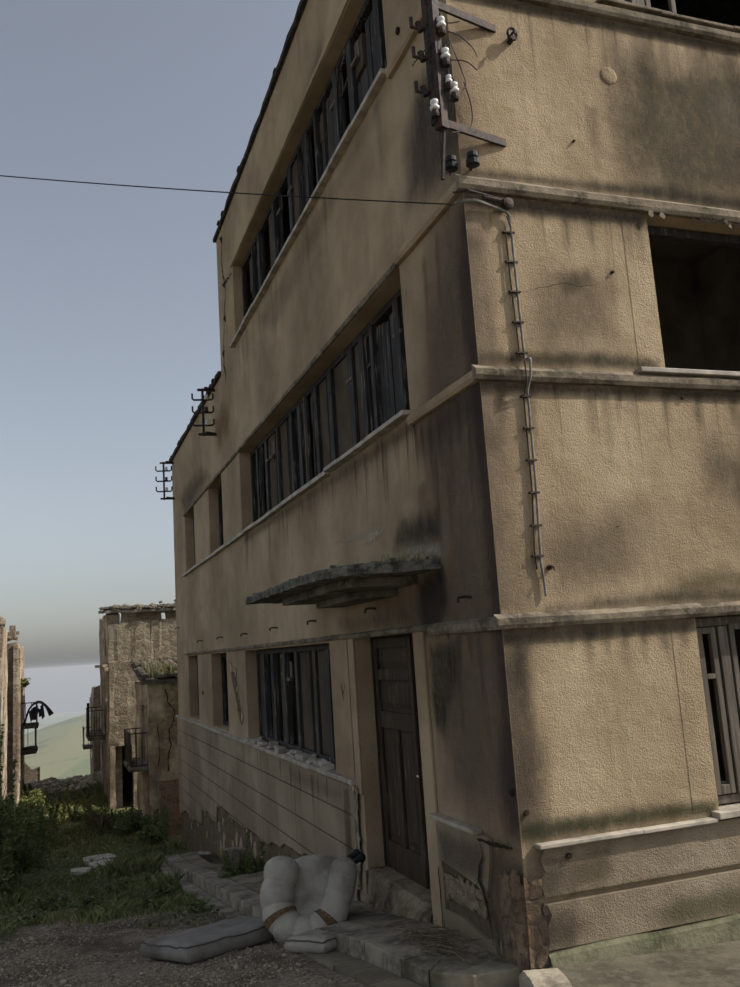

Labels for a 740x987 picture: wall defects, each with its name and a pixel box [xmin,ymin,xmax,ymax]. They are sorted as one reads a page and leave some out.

water stain [591,63,740,207]
water stain [432,195,740,619]
water stain [431,622,692,805]
spalling [159,779,308,866]
spalling [443,870,550,974]